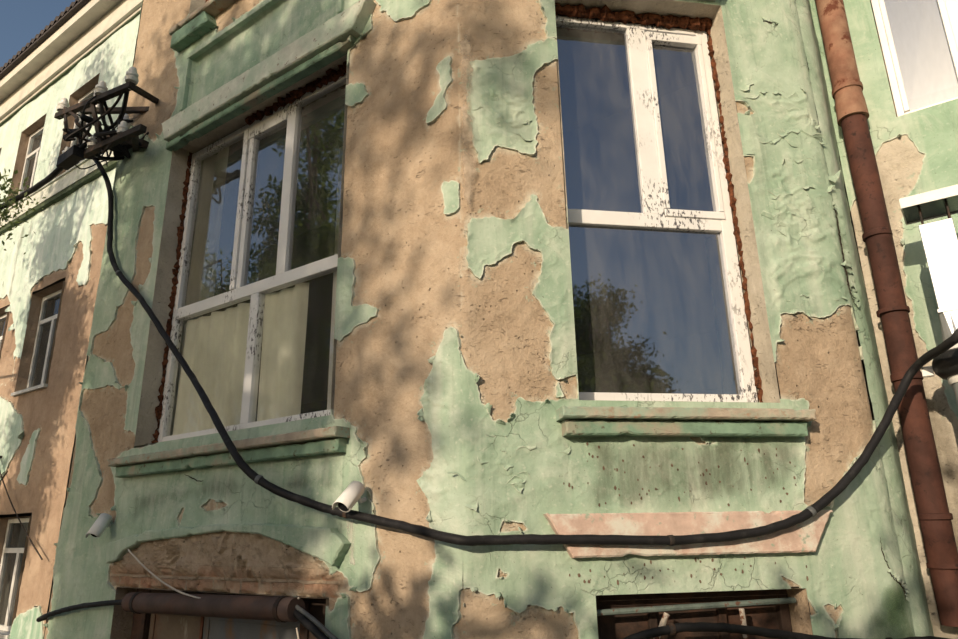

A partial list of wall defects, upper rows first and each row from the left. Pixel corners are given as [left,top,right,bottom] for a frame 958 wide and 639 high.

peeling [0,206,155,639]
peeling [109,0,578,639]
peeling [775,305,874,509]
crack [880,536,910,602]